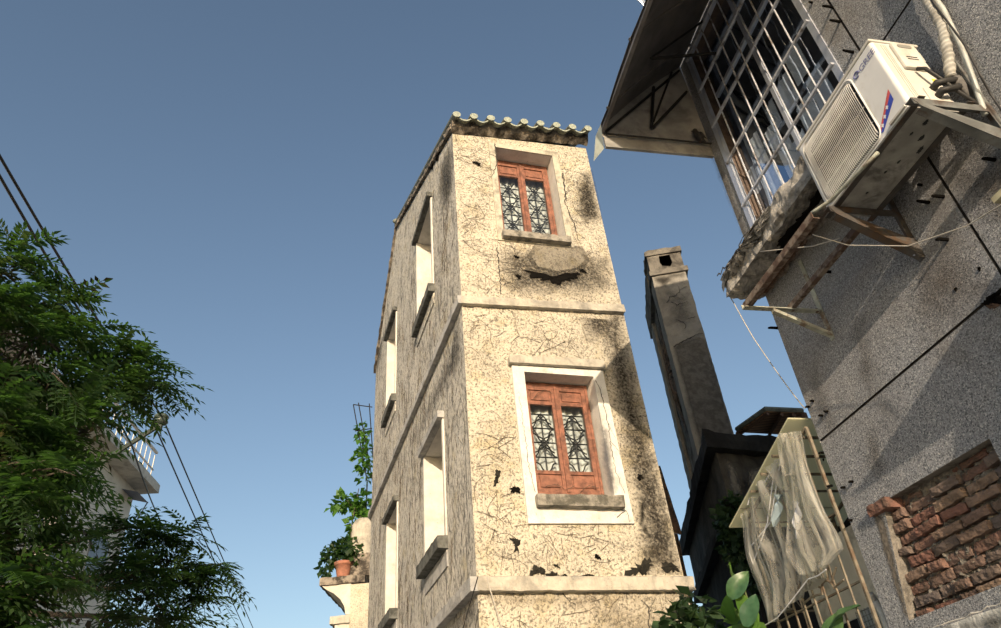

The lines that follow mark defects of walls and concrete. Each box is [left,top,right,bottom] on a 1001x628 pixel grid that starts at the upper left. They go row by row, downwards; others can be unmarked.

leakage [441,156,451,202]
leakage [579,175,597,218]
spalling [720,206,771,292]
spalling [775,189,822,254]
crack [666,286,701,347]
leakage [589,318,674,571]